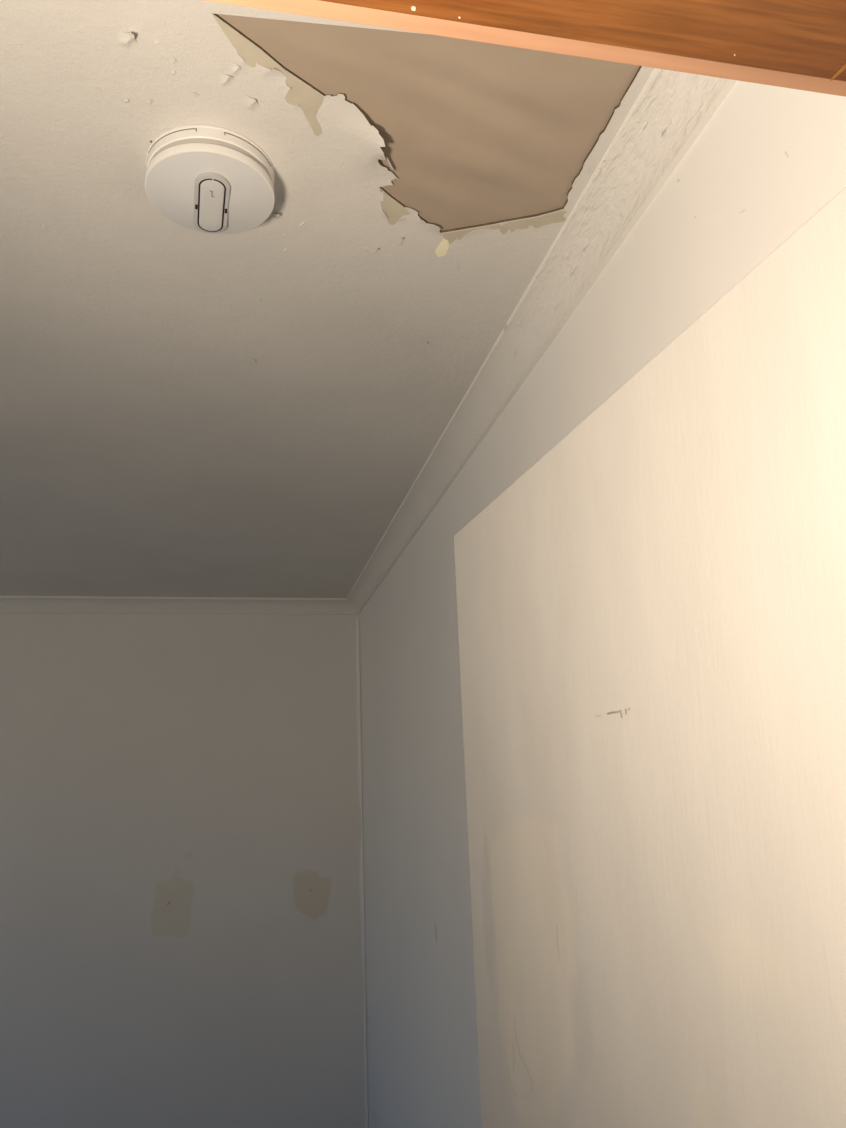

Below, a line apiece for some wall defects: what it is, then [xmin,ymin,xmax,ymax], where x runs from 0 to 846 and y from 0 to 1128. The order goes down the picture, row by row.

peeling [212,14,569,257]